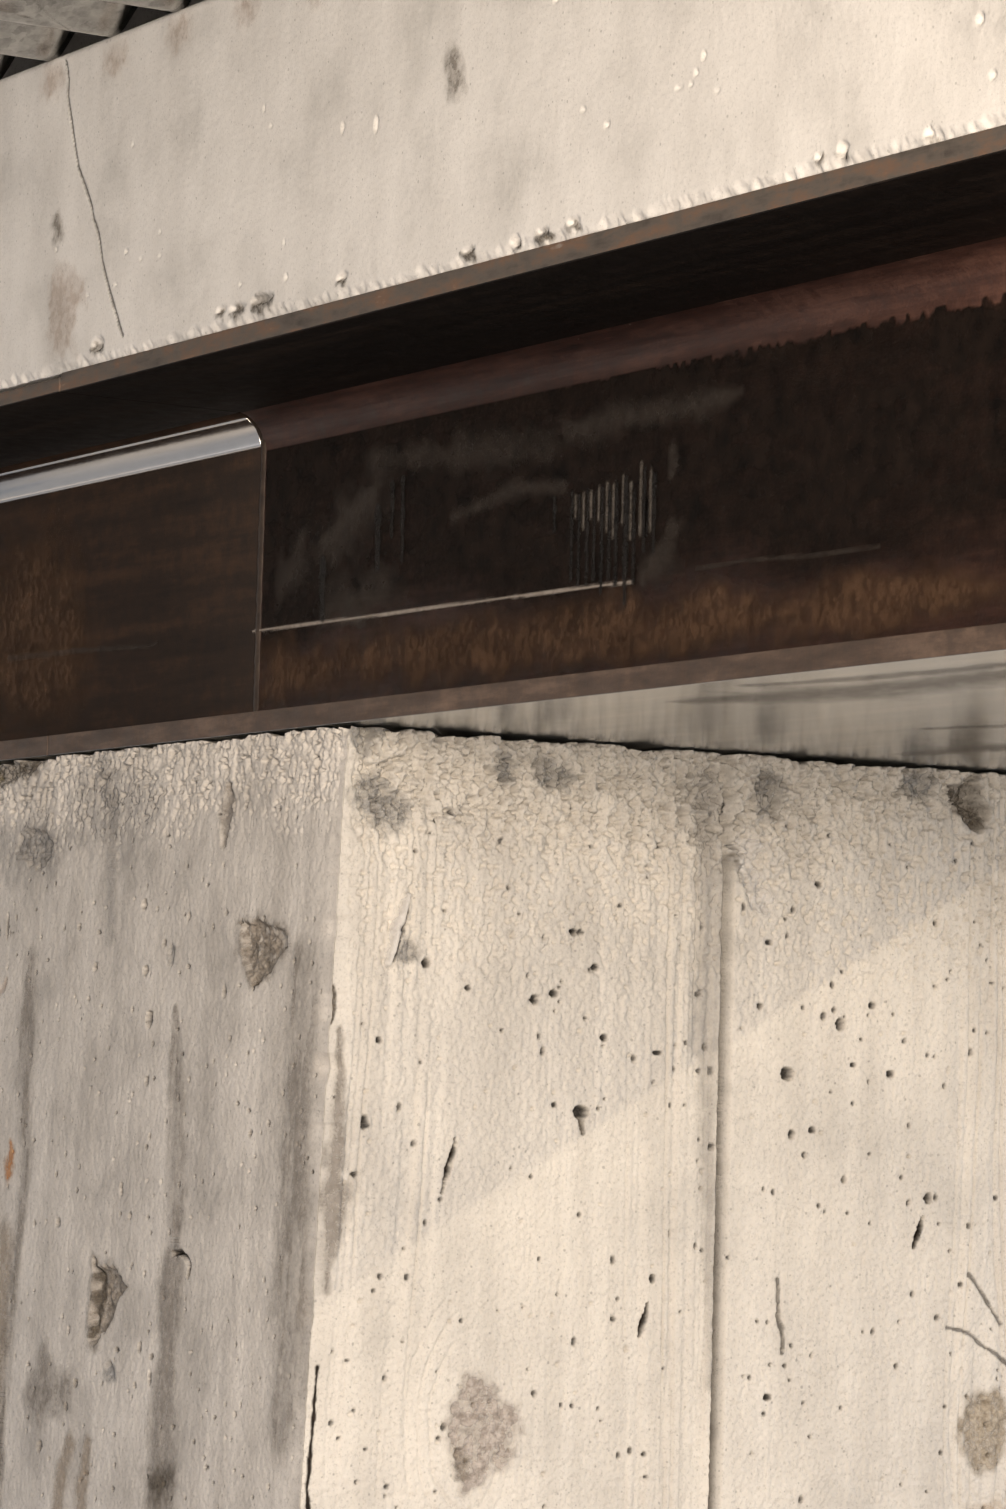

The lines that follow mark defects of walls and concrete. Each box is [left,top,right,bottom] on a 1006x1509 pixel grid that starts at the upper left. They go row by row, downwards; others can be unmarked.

leakage [446,54,461,92]
crack [66,60,124,336]
spalling [239,917,288,987]
leakage [0,957,33,1481]
leakage [277,1028,348,1355]
spalling [88,1264,128,1349]
leakage [27,1354,68,1422]
leakage [54,1437,89,1509]
leakage [148,1205,184,1509]
spalling [448,1377,521,1492]
spalling [958,1390,1006,1471]